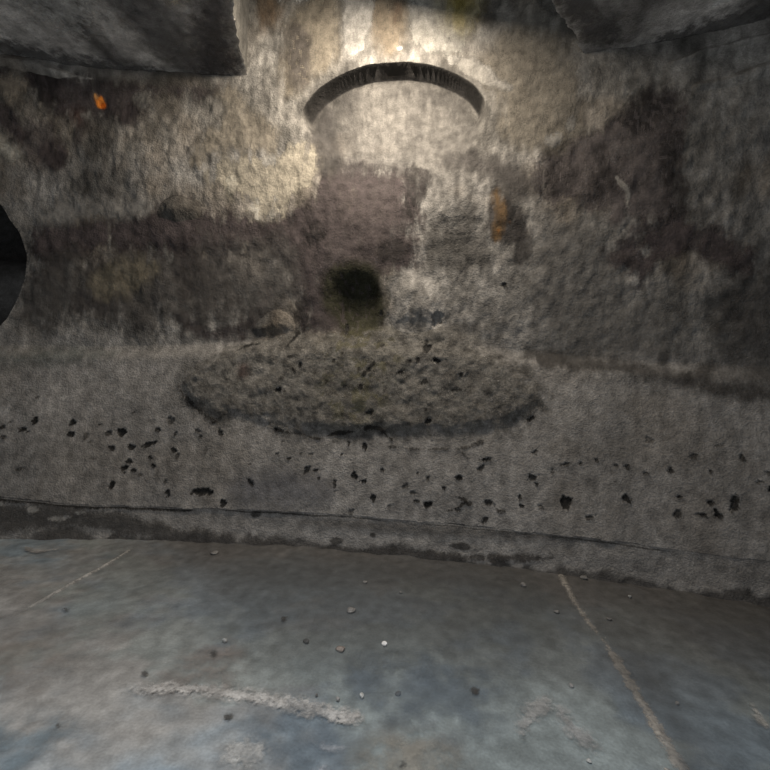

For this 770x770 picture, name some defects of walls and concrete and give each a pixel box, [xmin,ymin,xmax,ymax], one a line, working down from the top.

water stain [445,88,770,399]
spalling [98,424,160,477]
spalling [188,488,213,497]
spalling [560,496,572,510]
spalling [696,494,740,519]